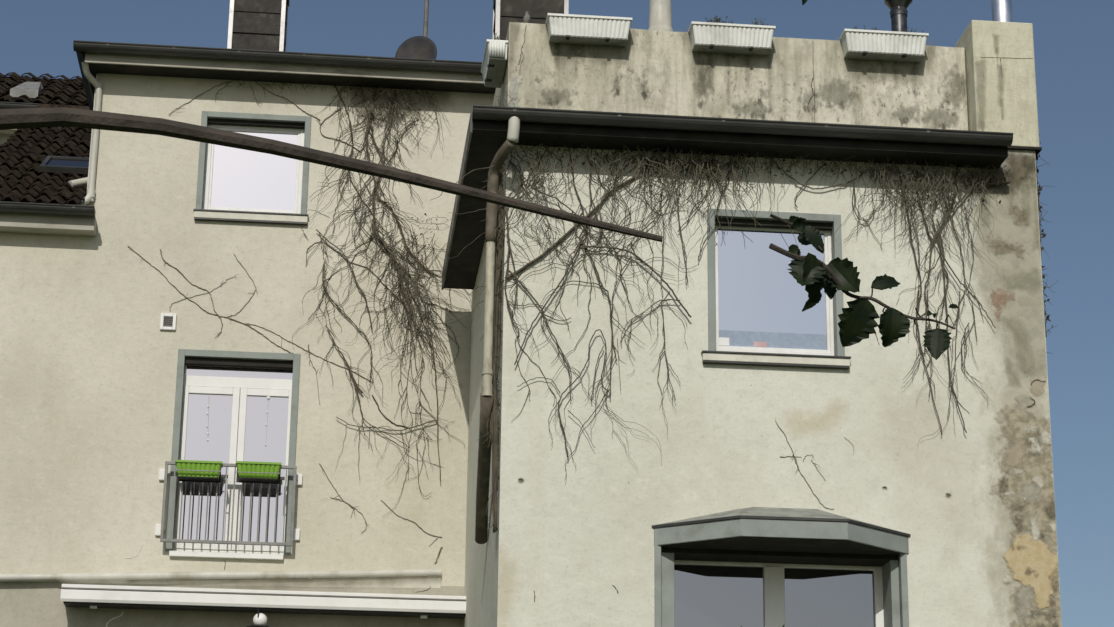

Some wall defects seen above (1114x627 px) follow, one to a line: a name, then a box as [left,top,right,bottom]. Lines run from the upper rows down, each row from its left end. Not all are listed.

damp [964,151,1038,246]
peeling [992,379,1062,627]